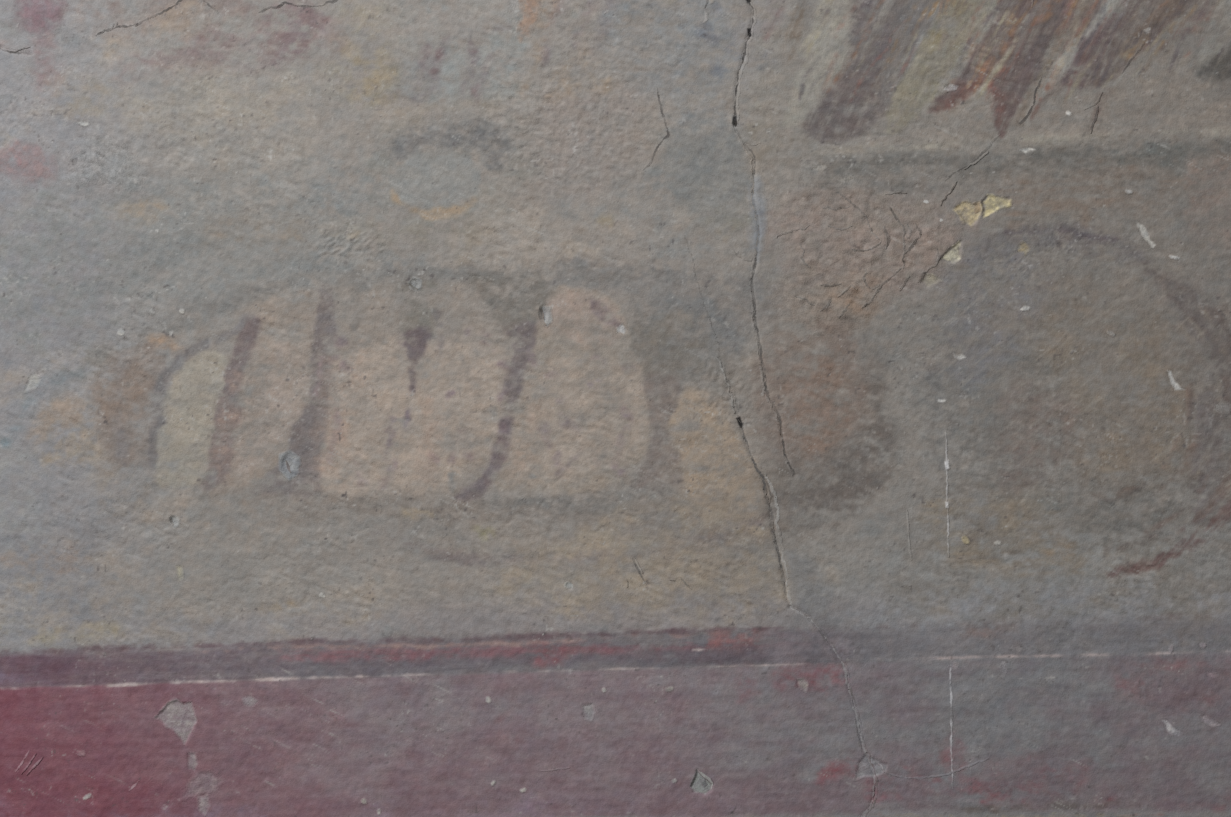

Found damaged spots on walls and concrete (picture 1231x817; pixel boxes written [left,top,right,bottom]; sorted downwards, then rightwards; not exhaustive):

crack [95,0,218,36]
crack [258,0,338,13]
crack [0,46,33,55]
crack [731,0,879,817]
peeling [153,697,227,817]